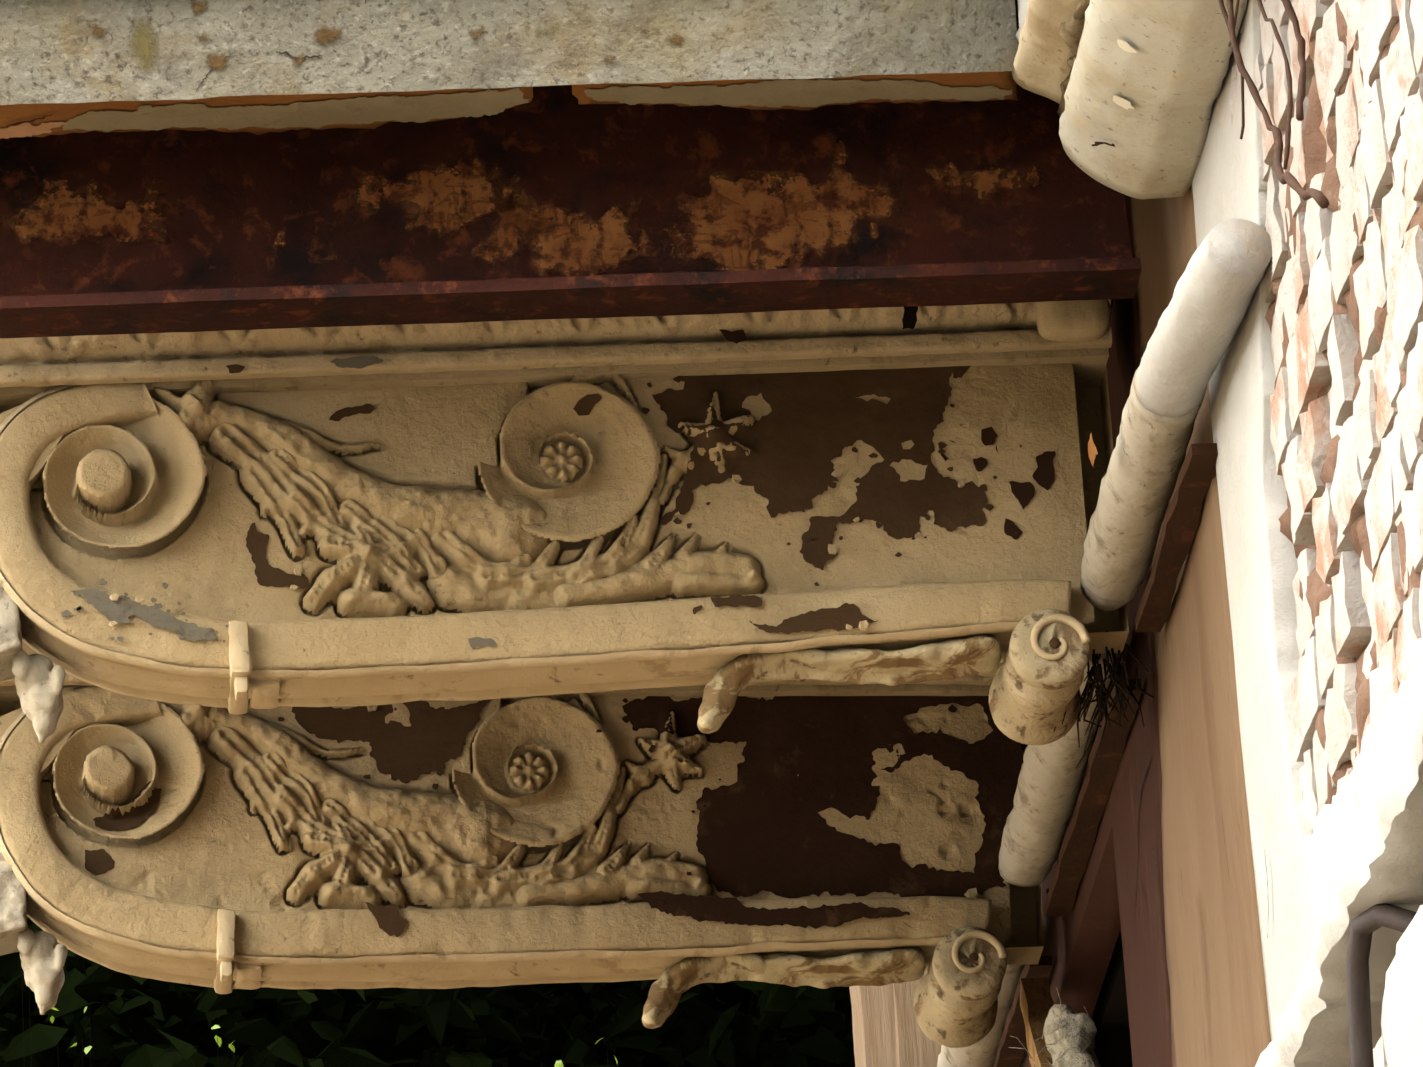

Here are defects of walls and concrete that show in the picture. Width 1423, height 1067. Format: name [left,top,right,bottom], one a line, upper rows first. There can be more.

spalling [0,88,529,139]
corrosion [0,180,182,245]
corrosion [353,158,651,277]
corrosion [665,141,900,272]
corrosion [925,161,1057,204]
peeling [641,366,1056,586]
peeling [246,523,311,590]
peeling [693,595,877,634]
peeling [622,696,1024,929]